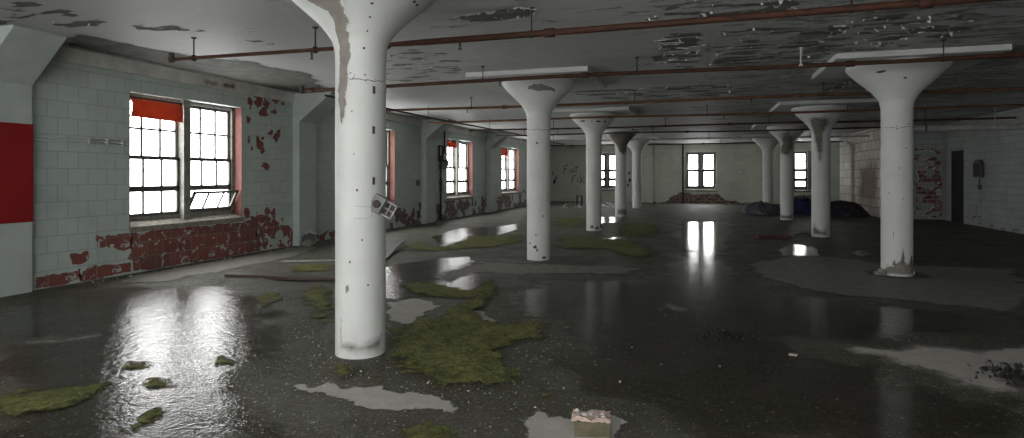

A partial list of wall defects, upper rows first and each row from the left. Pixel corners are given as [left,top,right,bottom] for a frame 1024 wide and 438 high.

peeling [0,2,105,28]
peeling [133,23,204,32]
peeling [452,6,537,23]
peeling [646,0,800,21]
peeling [651,13,981,72]
peeling [308,0,366,125]
spalling [246,96,285,170]
damp [811,118,828,158]
spalling [389,202,421,229]
spalling [436,190,526,221]
spalling [664,191,750,204]
spalling [34,207,335,289]